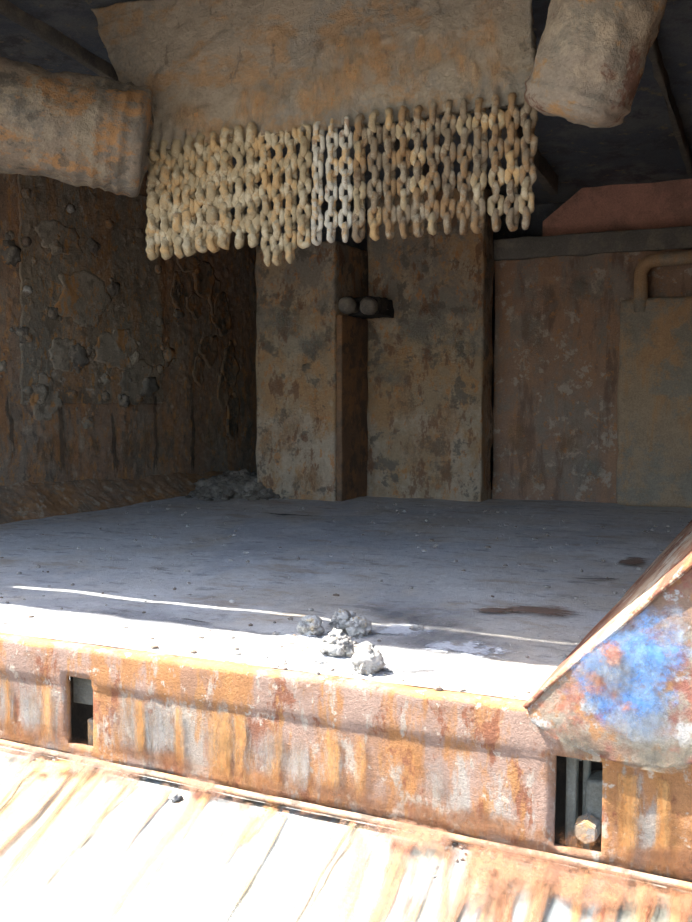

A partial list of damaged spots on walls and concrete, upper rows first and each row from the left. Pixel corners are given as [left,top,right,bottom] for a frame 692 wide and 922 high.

rust [5,681,51,740]
rust [114,701,151,760]
rust [164,707,224,796]
rust [213,713,246,776]
rust [317,731,377,809]
peeling [541,616,681,739]
rust [0,745,130,887]
rust [285,805,692,922]